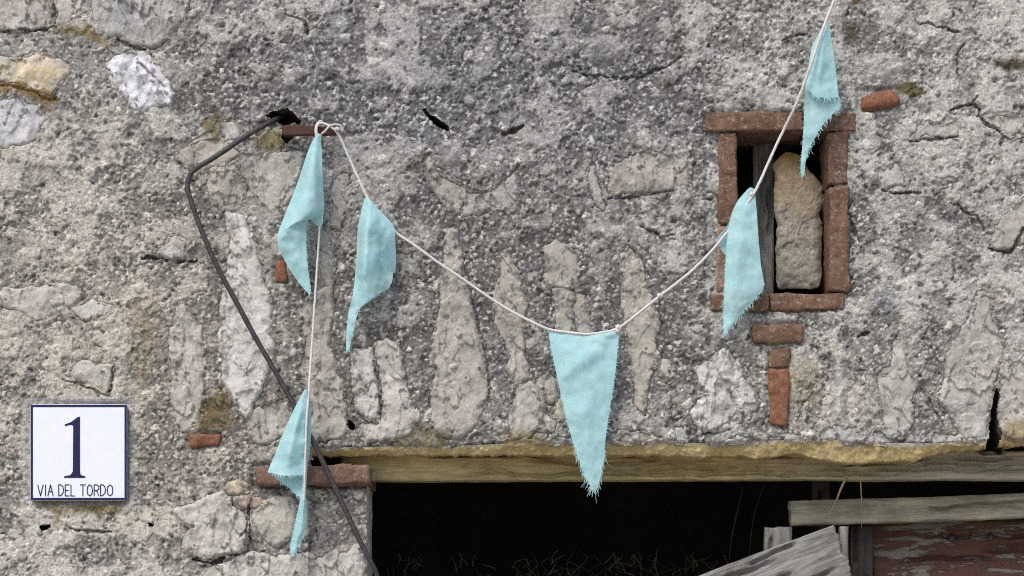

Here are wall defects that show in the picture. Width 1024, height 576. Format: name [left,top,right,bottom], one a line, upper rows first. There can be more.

crack [572,56,681,86]
crack [920,22,964,75]
crack [909,135,958,143]
crack [949,96,1022,141]